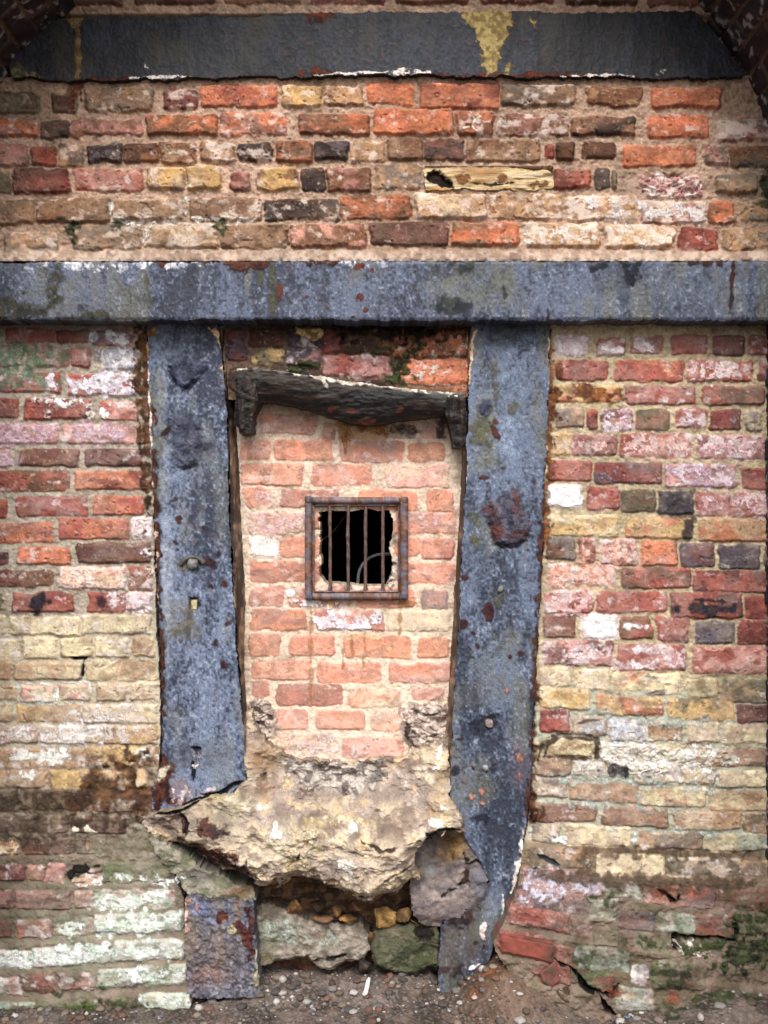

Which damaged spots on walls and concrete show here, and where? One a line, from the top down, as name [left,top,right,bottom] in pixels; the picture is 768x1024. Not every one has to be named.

spalling [247,697,281,744]
spalling [398,696,448,748]
leakage [0,680,159,848]
crack [178,781,242,806]
leakage [0,874,185,983]
leakage [156,996,191,1007]
crack [534,959,617,1015]